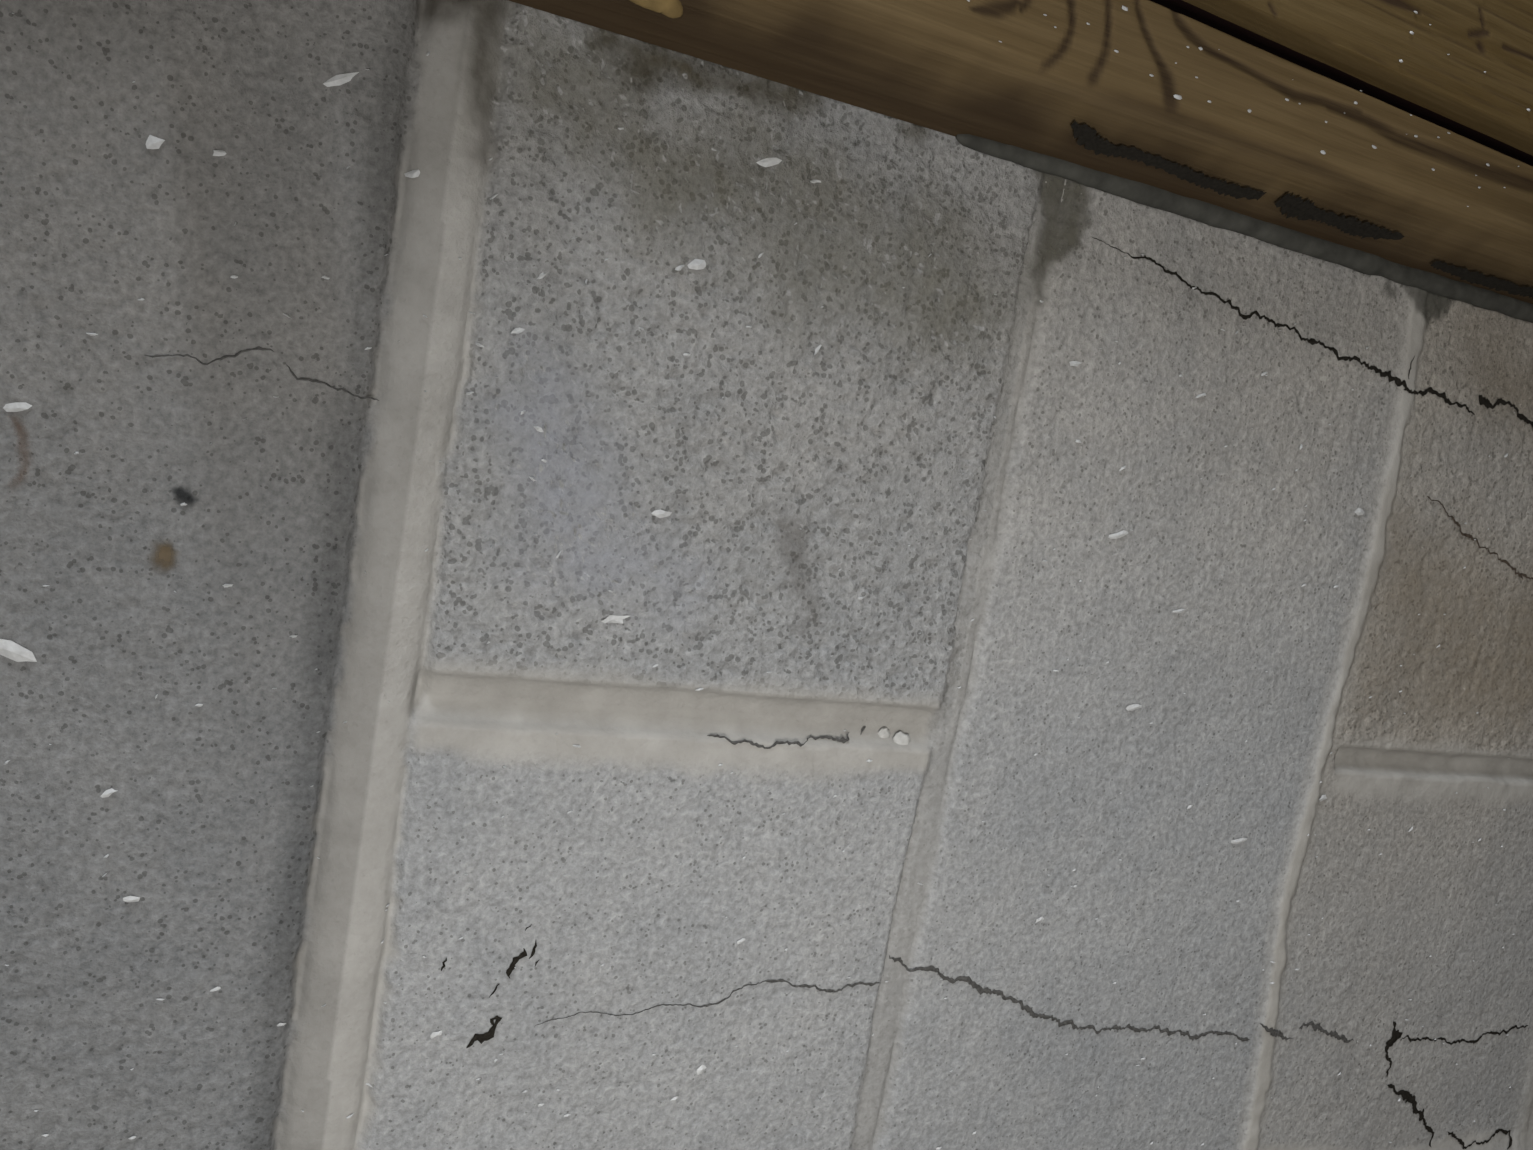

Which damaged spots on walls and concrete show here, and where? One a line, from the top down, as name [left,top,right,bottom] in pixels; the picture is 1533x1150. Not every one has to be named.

damp [1038,171,1086,268]
crack [1071,121,1405,240]
crack [1094,238,1533,427]
crack [707,726,866,749]
crack [535,955,1528,1150]